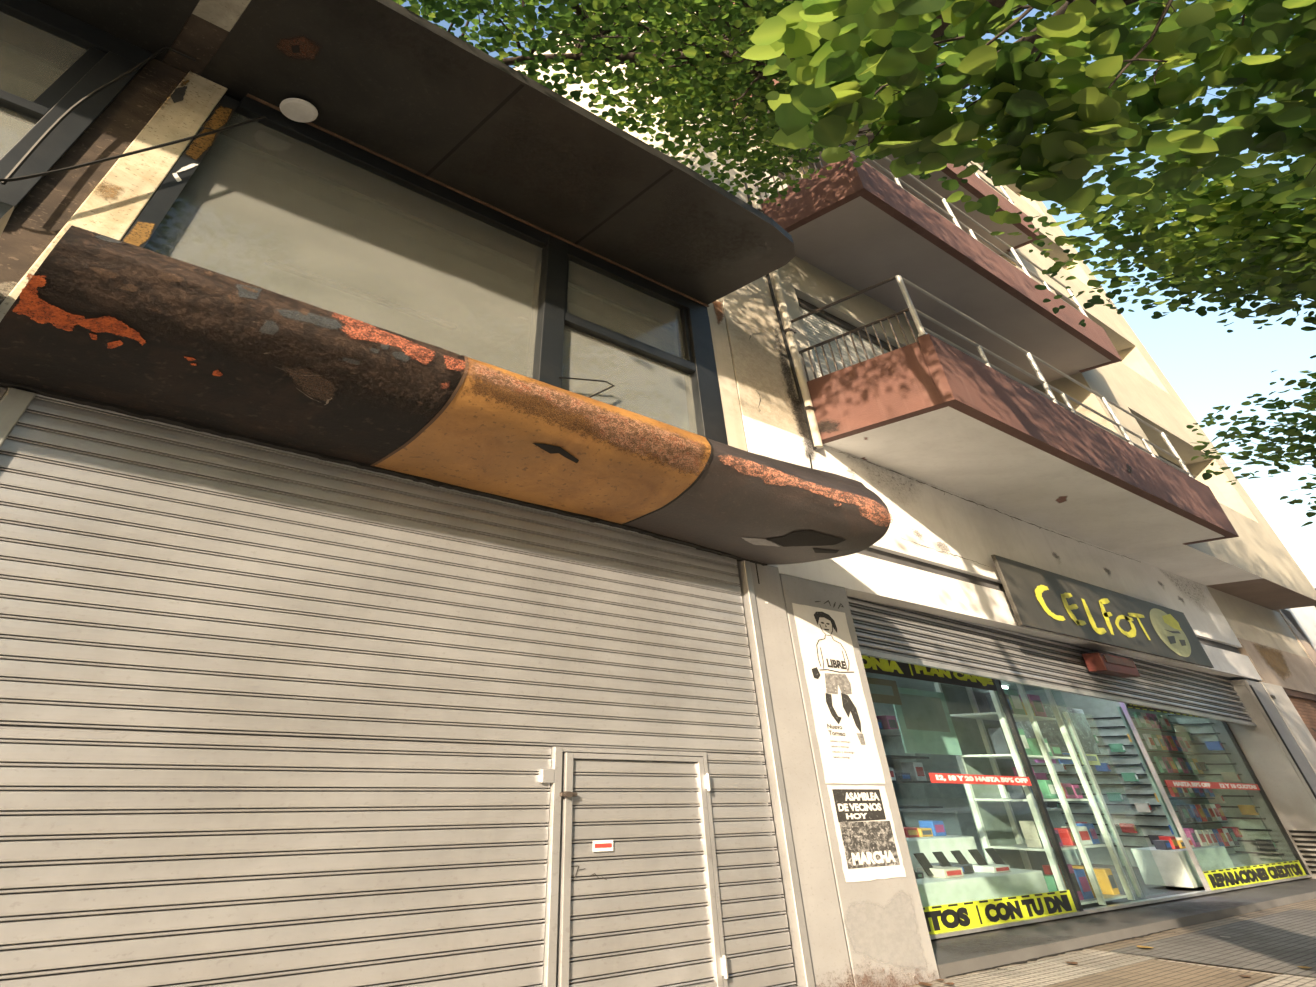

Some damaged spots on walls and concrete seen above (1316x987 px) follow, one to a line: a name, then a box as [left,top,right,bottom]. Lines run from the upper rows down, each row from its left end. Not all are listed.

rust [331,311,704,472]